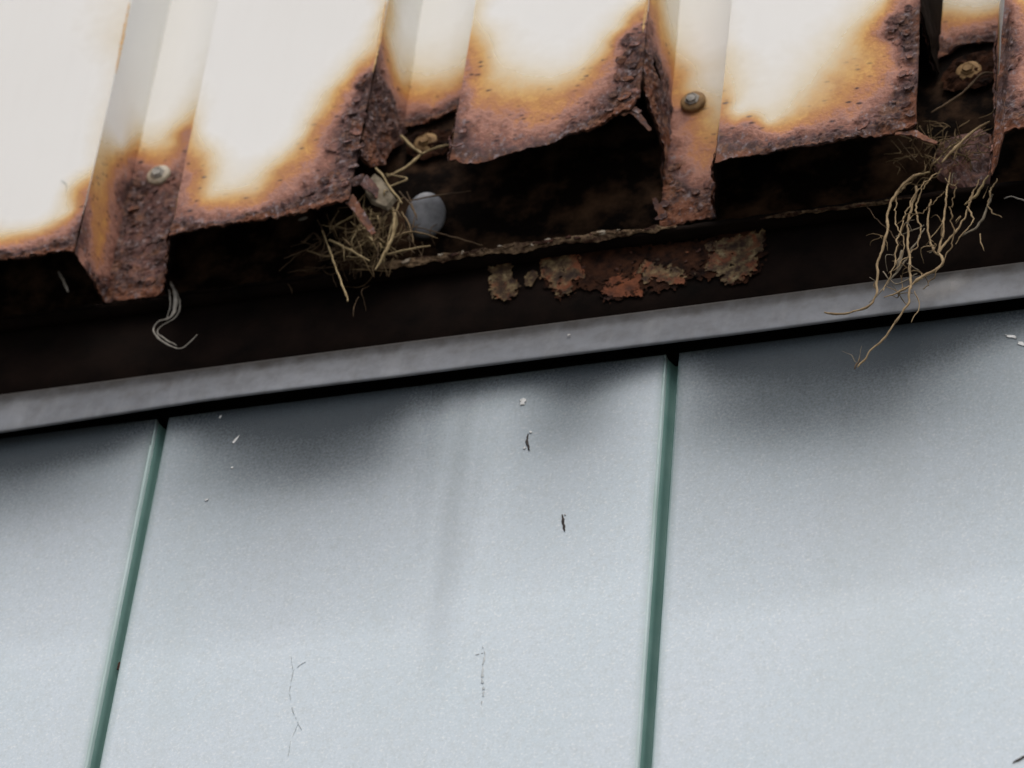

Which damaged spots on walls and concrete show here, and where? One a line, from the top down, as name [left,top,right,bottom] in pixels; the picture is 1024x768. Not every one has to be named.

rust [0,0,1024,303]
peeling [488,228,768,304]